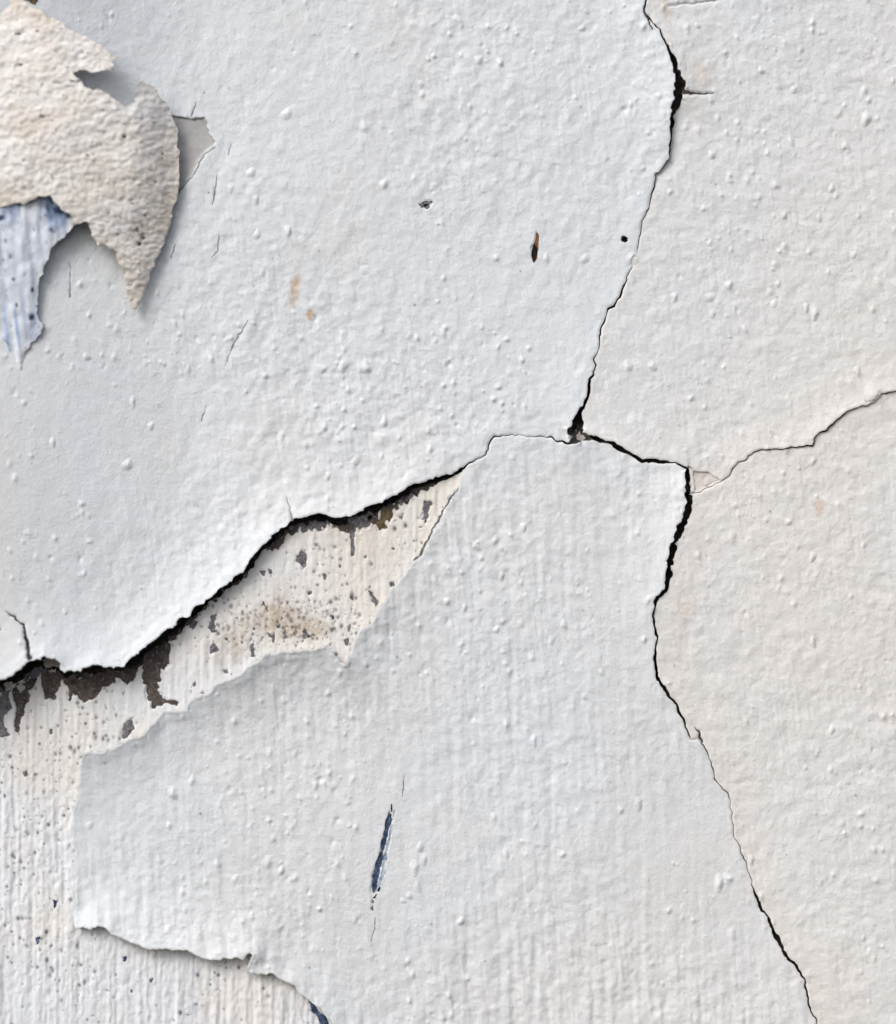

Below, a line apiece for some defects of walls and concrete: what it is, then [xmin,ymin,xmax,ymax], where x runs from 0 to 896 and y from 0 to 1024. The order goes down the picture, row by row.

peeling [0,0,214,370]
crack [637,0,716,249]
peeling [0,472,462,1024]
crack [0,268,867,1024]